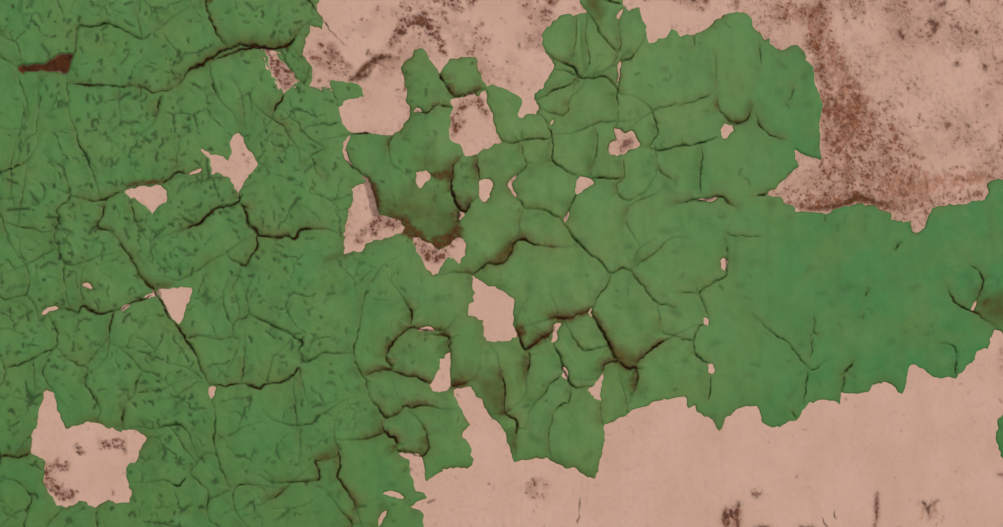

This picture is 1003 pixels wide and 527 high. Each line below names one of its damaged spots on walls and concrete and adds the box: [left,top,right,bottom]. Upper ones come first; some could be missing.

peeling [31,390,147,508]
crack [11,193,201,373]
crack [147,0,295,109]
peeling [190,133,258,193]
crack [188,196,311,266]
crack [353,308,452,457]
peeling [261,0,587,164]
peeling [468,276,517,342]
crack [518,267,665,406]
peeling [383,330,1003,527]
peeling [617,0,1003,233]
corrosion [769,1,991,211]